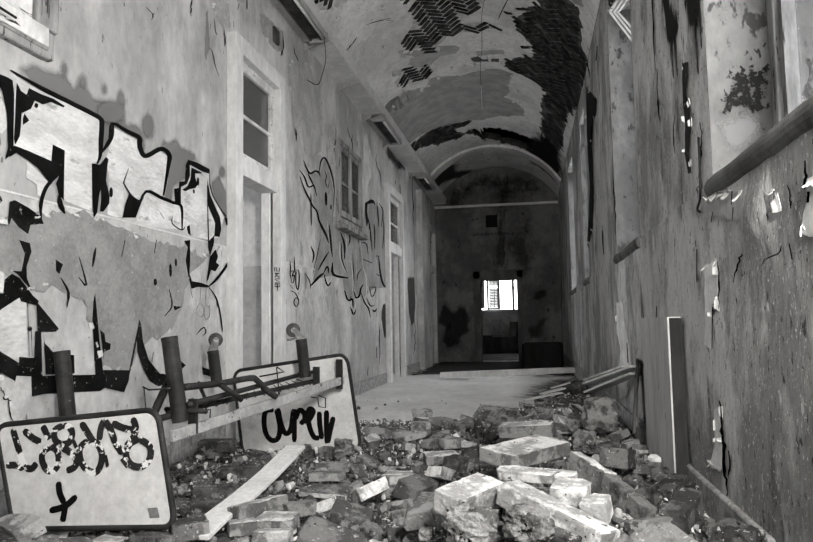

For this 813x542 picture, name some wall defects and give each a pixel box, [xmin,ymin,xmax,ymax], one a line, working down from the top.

flaking render [313,0,348,10]
crack [651,0,675,153]
peeling [363,133,373,196]
flaking render [385,0,597,248]
crack [764,139,813,219]
peeling [800,176,813,237]
peeling [0,209,210,370]
water stain [439,304,470,347]
peeling [701,258,720,349]
crack [712,254,743,338]
crack [761,243,793,266]
crack [719,401,731,496]